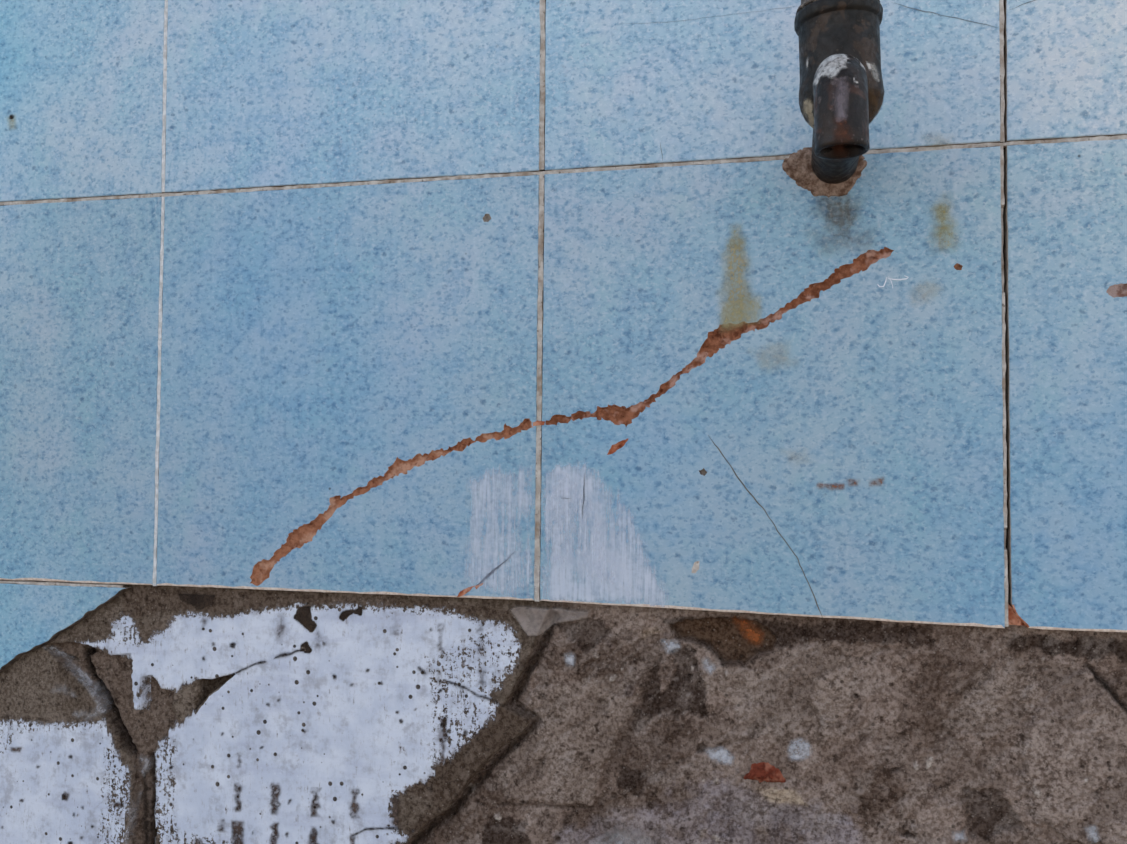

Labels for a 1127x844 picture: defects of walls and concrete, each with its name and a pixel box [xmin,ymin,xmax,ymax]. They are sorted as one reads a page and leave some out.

spalling [1106,283,1127,298]
crack [250,247,894,586]
crack [457,552,514,597]
crack [710,438,823,618]
spalling [1008,604,1025,626]
crack [87,649,136,748]
peeling [75,594,589,844]
crack [1089,666,1127,712]
peeling [0,718,132,844]
crack [143,774,156,844]